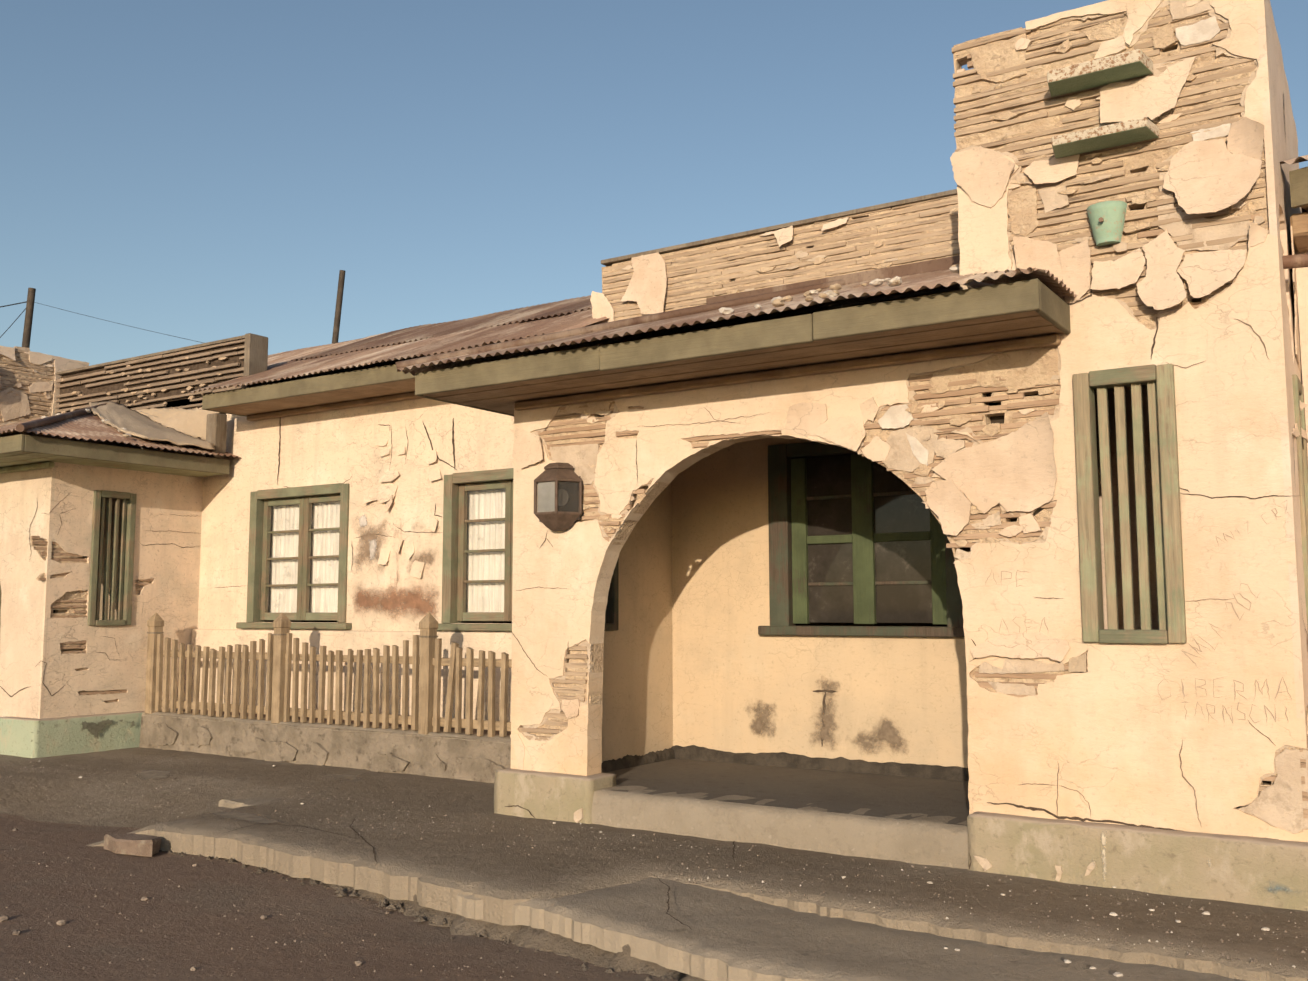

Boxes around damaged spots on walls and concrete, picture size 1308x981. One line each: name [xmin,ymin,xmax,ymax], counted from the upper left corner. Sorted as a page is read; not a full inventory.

flaking render [761,226,793,247]
flaking render [821,217,849,231]
spalling [950,0,1301,373]
flaking render [590,252,667,325]
spalling [0,346,55,425]
spalling [682,345,1061,564]
spalling [30,536,88,618]
spalling [970,632,1088,697]
spalling [510,640,604,770]
water stain [751,704,774,735]
water stain [818,682,836,745]
spalling [1238,708,1308,834]